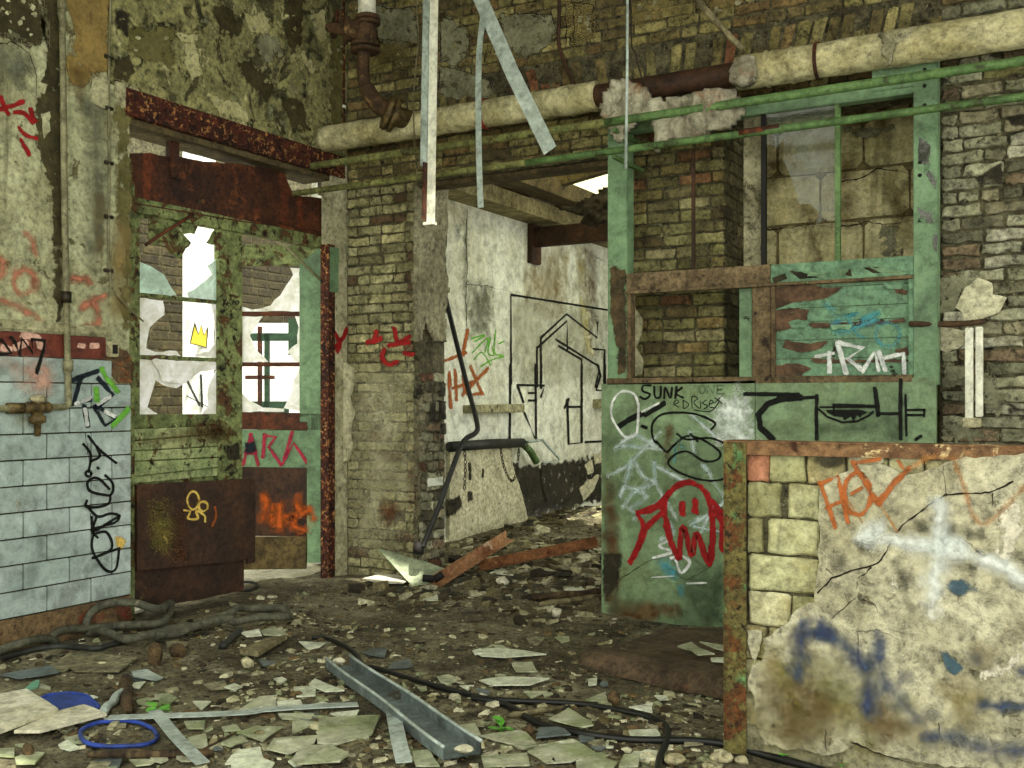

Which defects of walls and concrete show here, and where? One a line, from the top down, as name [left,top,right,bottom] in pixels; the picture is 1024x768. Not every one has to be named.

peeling [90,10,203,109]
peeling [214,0,346,134]
peeling [207,91,252,123]
peeling [772,265,908,376]
flaking render [815,456,884,468]
crack [817,468,1014,641]
peeling [996,502,1024,560]
flaking render [747,630,763,661]
peeling [980,644,1024,680]